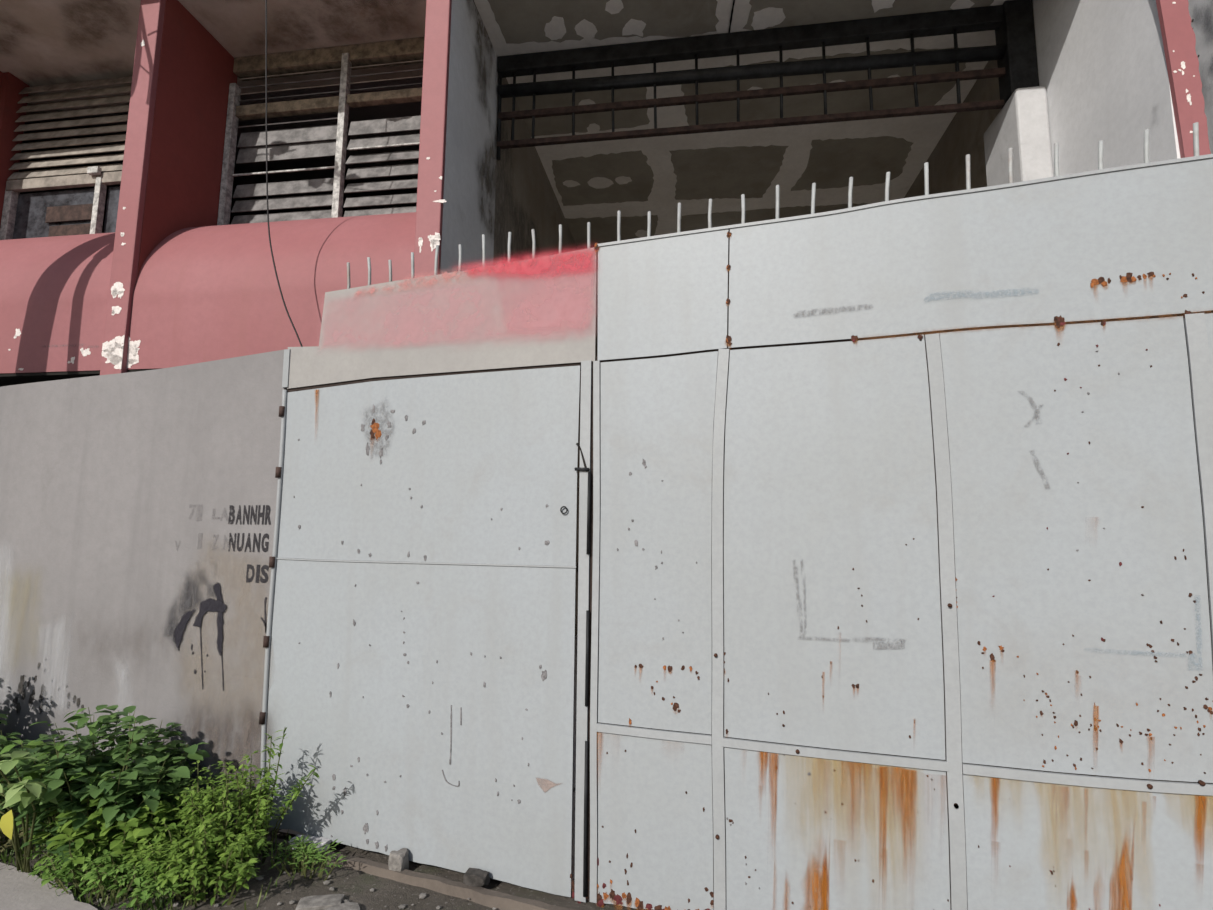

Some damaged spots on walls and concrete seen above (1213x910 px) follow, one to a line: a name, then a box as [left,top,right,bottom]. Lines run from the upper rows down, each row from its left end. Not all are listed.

crack [727,0,735,33]
rust [1090,272,1171,288]
rust [1054,315,1065,328]
peeling [67,335,141,369]
rust [370,418,382,440]
rust [977,641,1019,669]
rust [1024,690,1094,770]
rust [1071,693,1101,733]
rust [1157,697,1213,736]
rust [1196,796,1206,843]
rust [570,853,714,910]
rust [809,861,827,910]